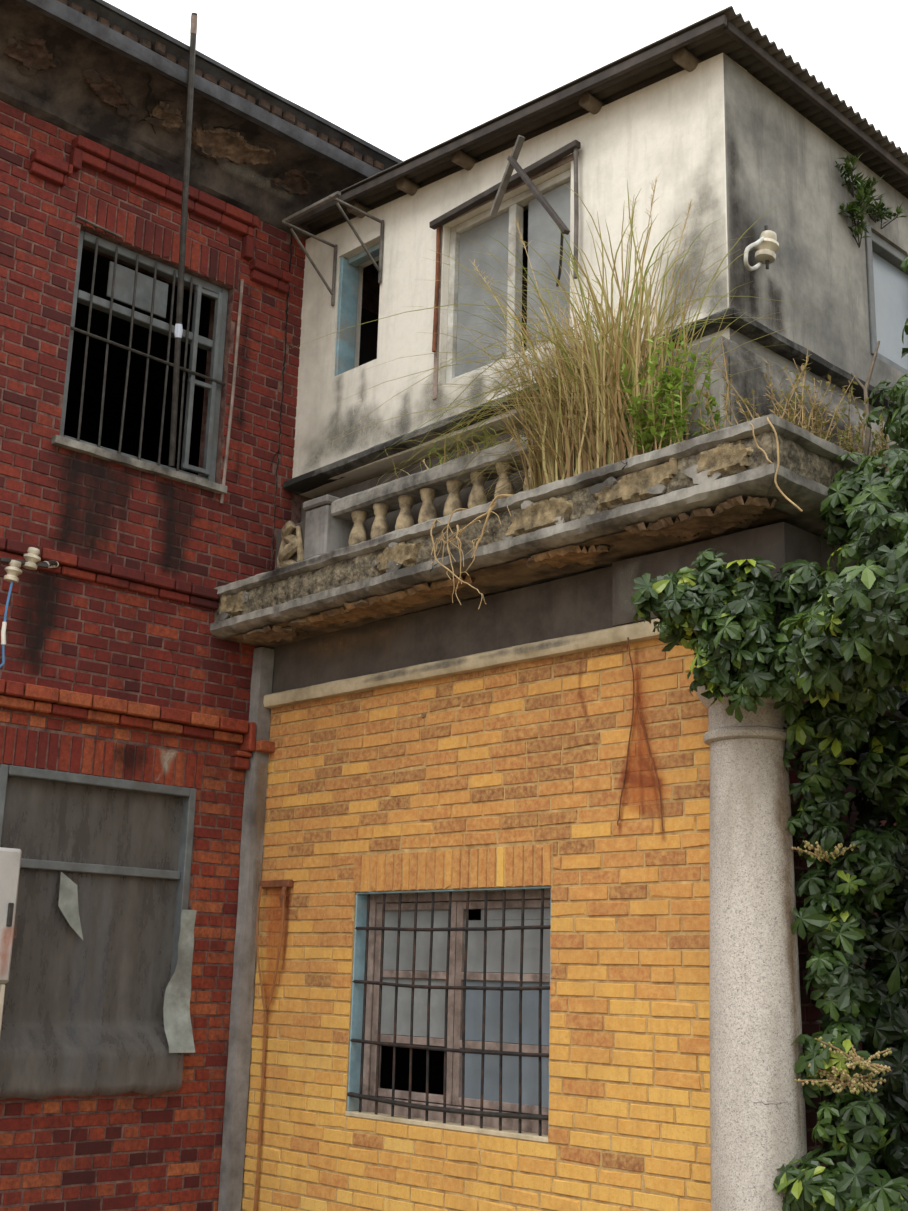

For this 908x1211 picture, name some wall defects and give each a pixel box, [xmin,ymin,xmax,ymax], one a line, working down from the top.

spalling [144,101,276,165]
water stain [770,286,782,330]
spalling [502,496,573,540]
spalling [372,541,422,576]
spalling [527,544,614,568]
spalling [218,590,249,620]
spalling [242,575,475,643]